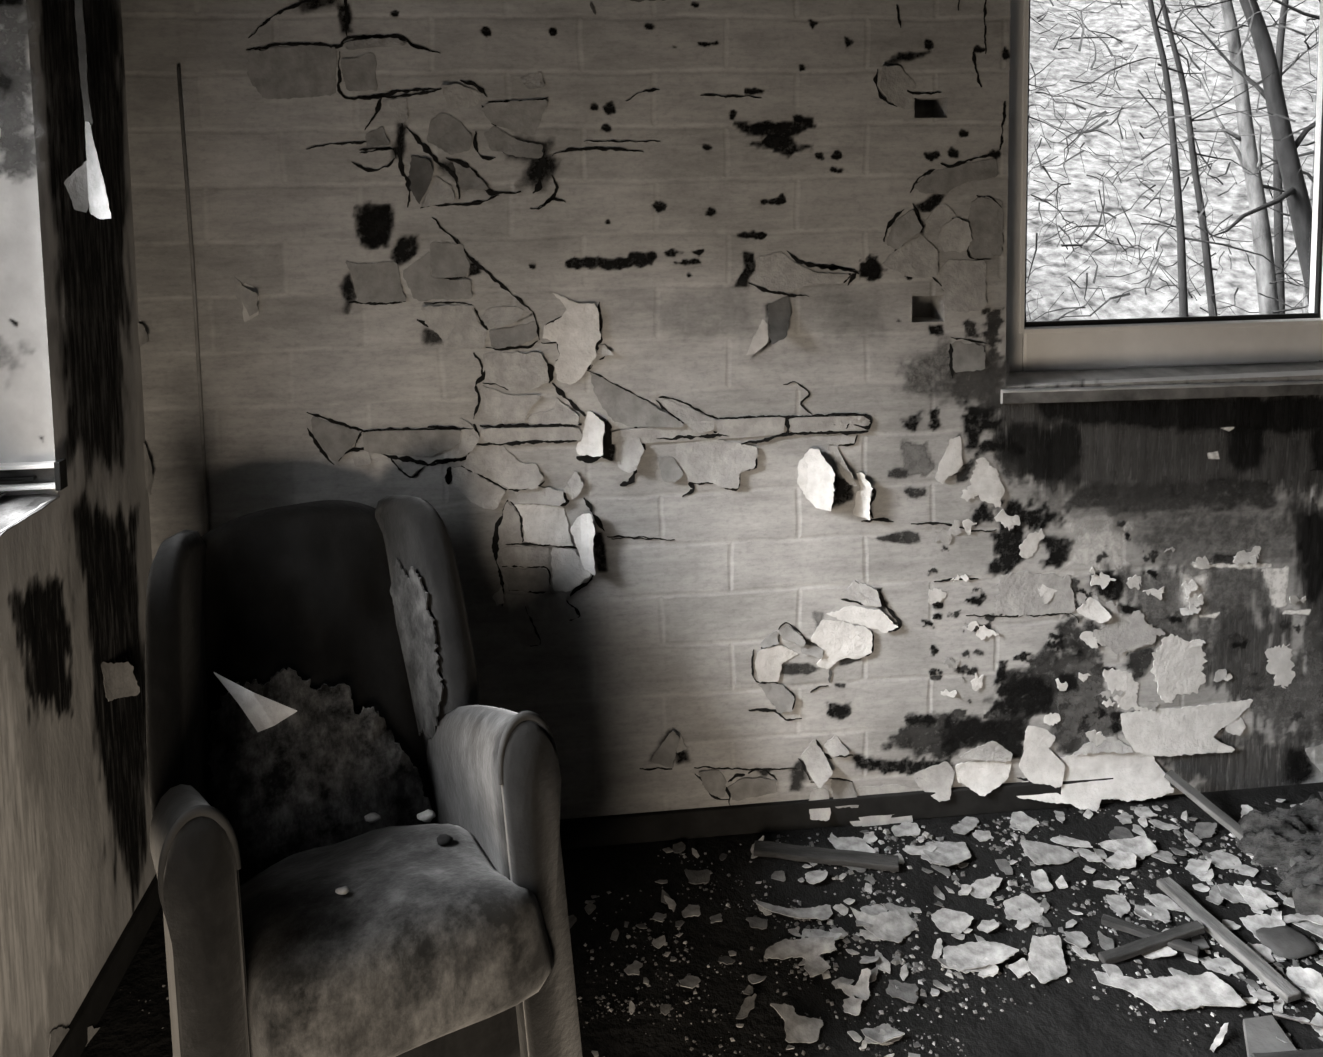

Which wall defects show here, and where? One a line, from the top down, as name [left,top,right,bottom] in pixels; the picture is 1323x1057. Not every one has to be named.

crack [958,0,1006,150]
crack [552,140,660,156]
crack [432,217,533,312]
peeling [247,0,758,647]
crack [783,381,813,415]
leakage [0,0,148,914]
leakage [876,531,920,544]
leakage [883,343,1323,793]
peeling [640,434,1253,853]
peeling [1265,644,1295,688]
peeling [1285,744,1323,783]
peeling [1098,836,1158,860]